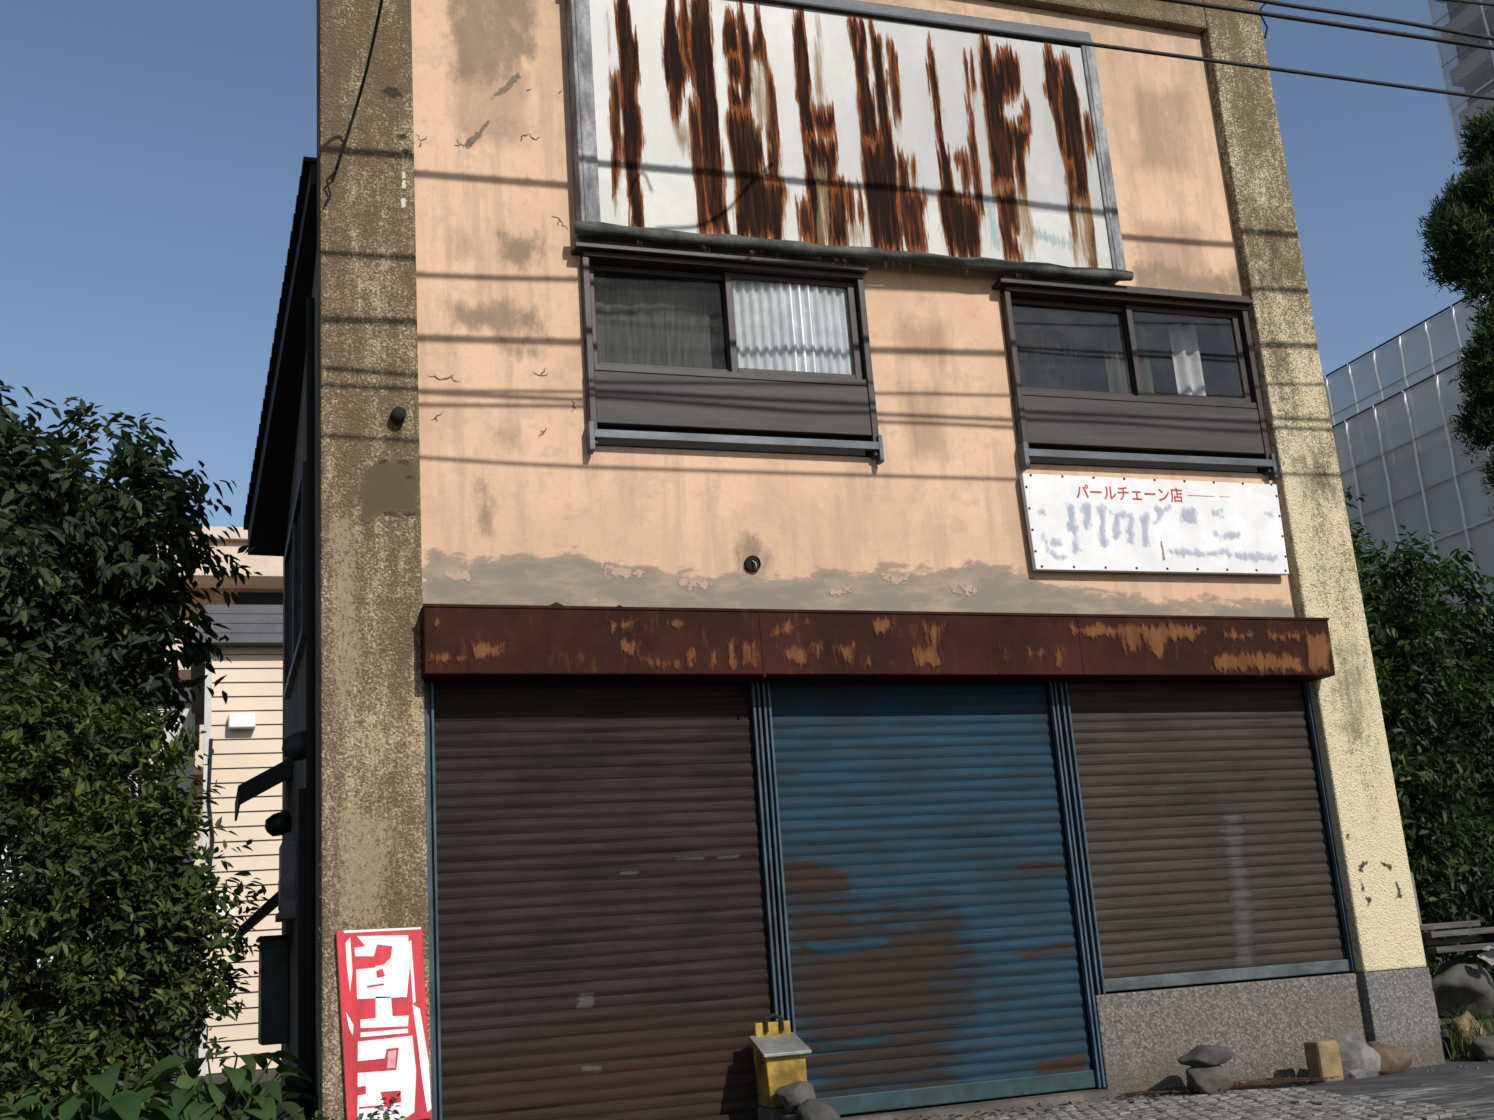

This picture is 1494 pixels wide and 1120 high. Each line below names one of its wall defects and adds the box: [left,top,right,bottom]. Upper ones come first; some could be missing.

leakage [449,0,534,78]
corrosion [609,0,645,227]
corrosion [662,0,1098,269]
peeling [422,548,1332,674]
corrosion [1018,861,1063,873]
corrosion [442,857,975,1120]
corrosion [1016,943,1075,958]
corrosion [1036,1054,1088,1073]